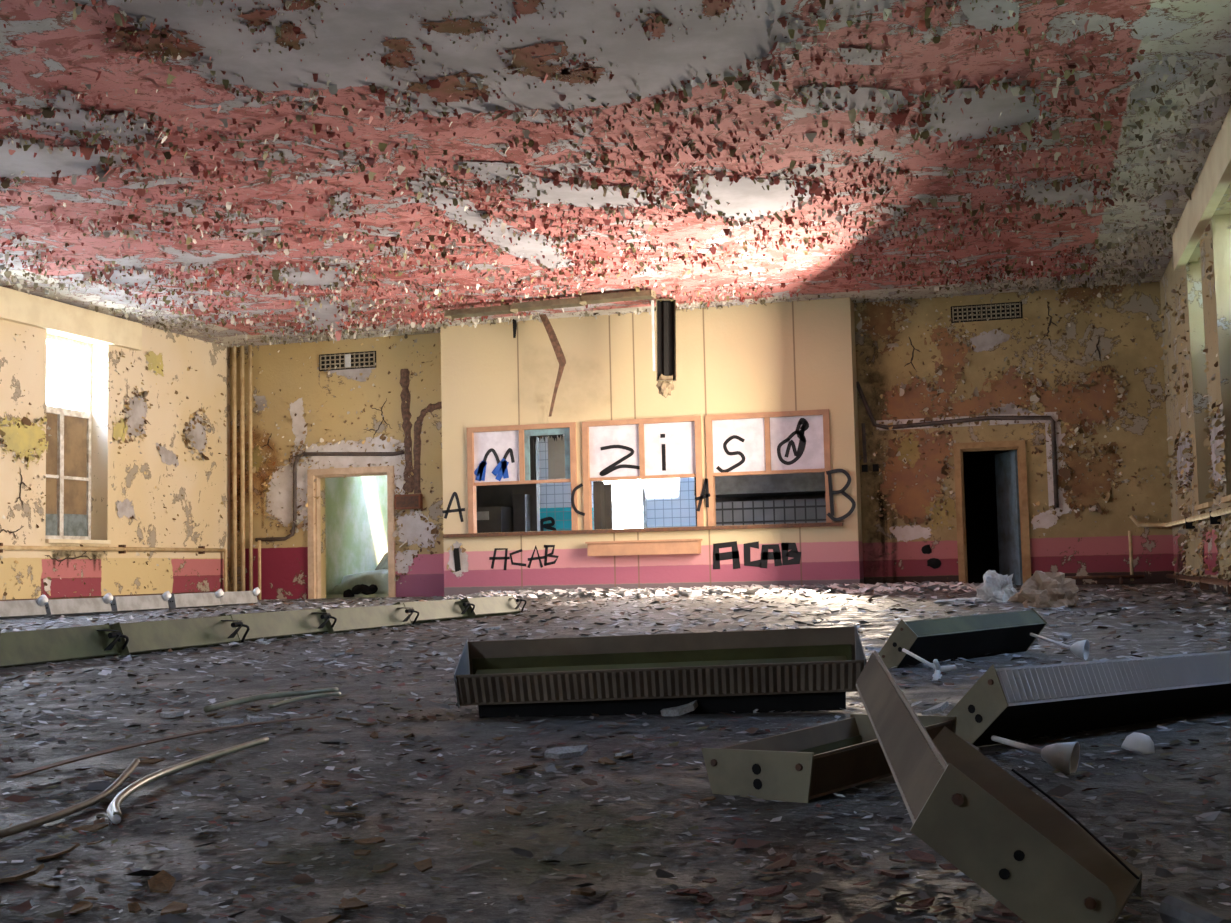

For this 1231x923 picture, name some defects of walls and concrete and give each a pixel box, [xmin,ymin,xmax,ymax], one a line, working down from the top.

peeling [0,0,1231,597]